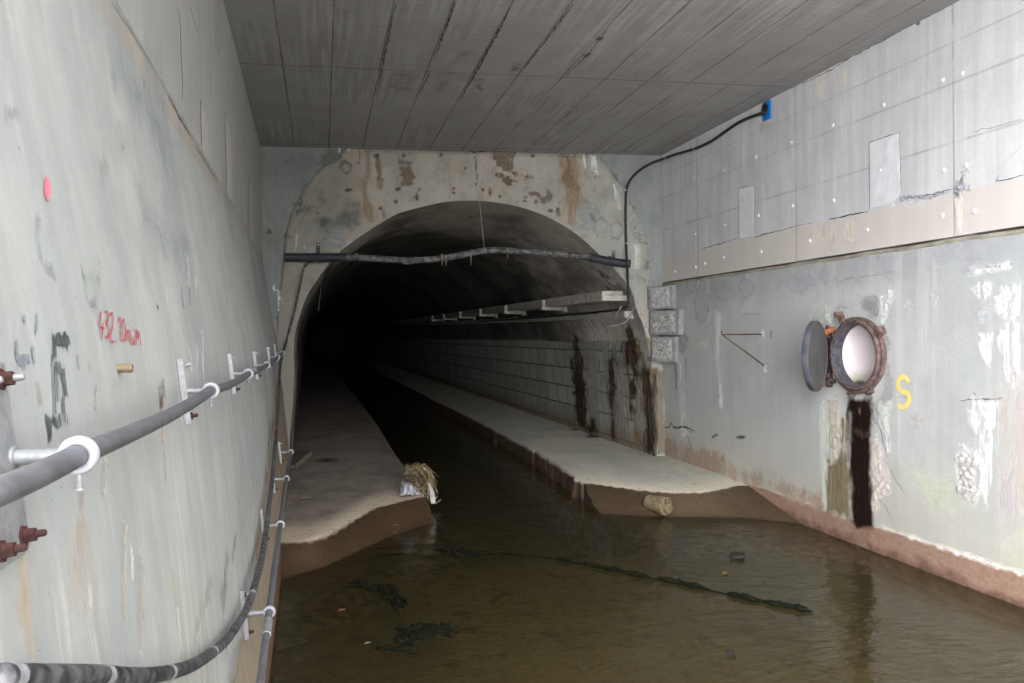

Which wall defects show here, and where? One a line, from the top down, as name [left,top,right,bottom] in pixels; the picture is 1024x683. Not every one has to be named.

rust [359,150,384,222]
rust [559,154,580,225]
water stain [862,292,892,346]
water stain [569,324,687,456]
peeling [828,395,842,463]
water stain [745,363,1024,624]
spalling [955,449,985,503]